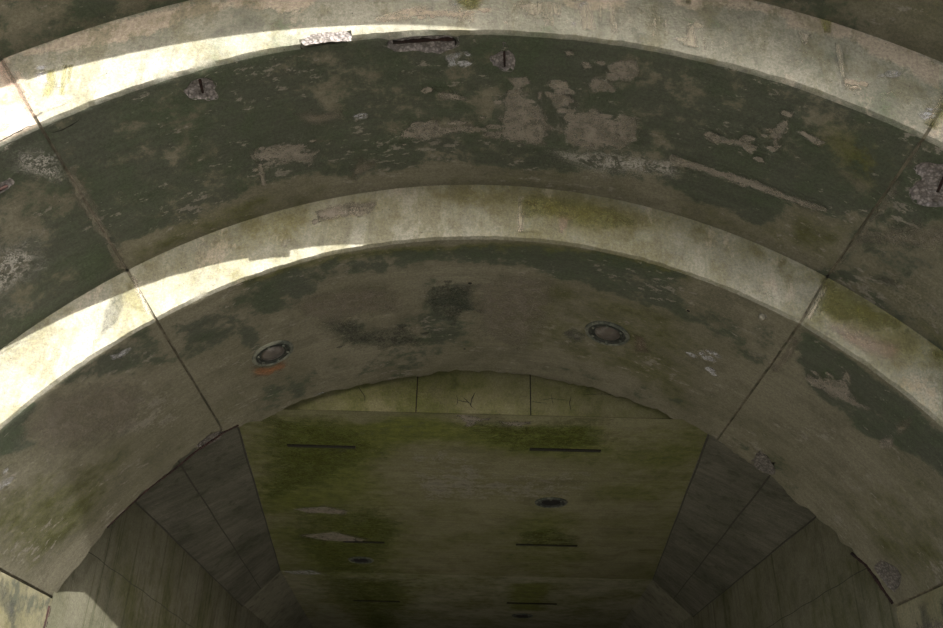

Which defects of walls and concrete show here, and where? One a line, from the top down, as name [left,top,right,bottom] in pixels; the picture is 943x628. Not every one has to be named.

spalling [383,35,459,54]
spalling [184,78,219,101]
peeling [401,42,640,150]
spalling [909,162,943,207]